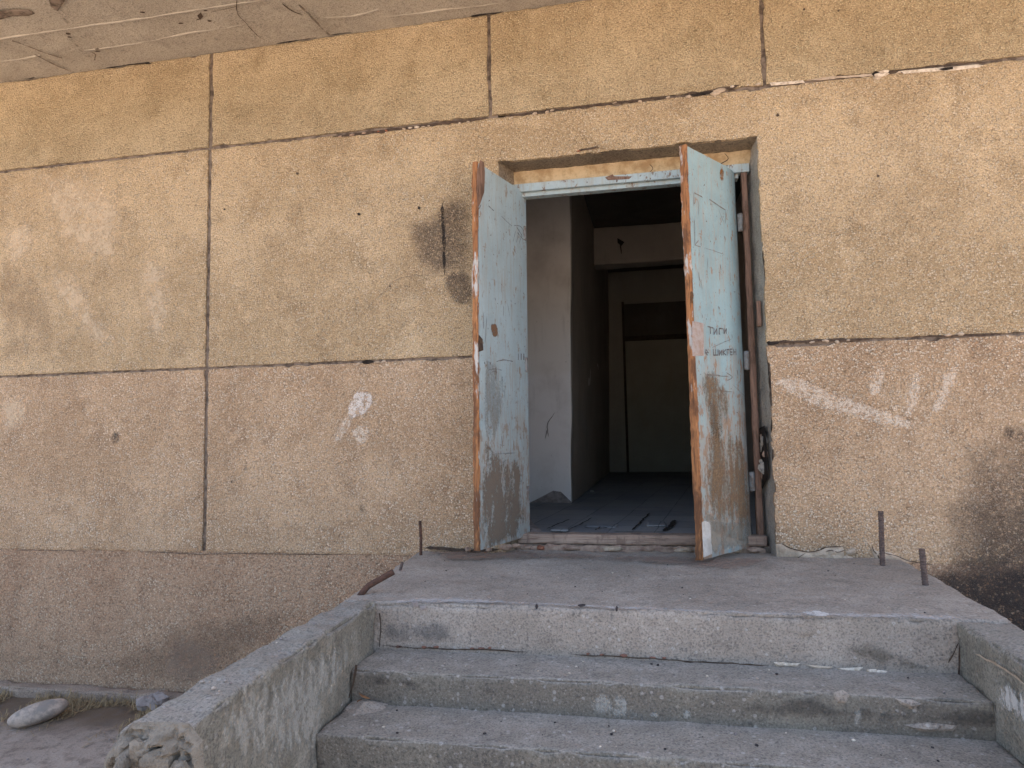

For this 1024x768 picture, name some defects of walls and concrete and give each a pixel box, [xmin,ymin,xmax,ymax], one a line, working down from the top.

damp [933,573,1024,630]
spalling [103,722,204,768]